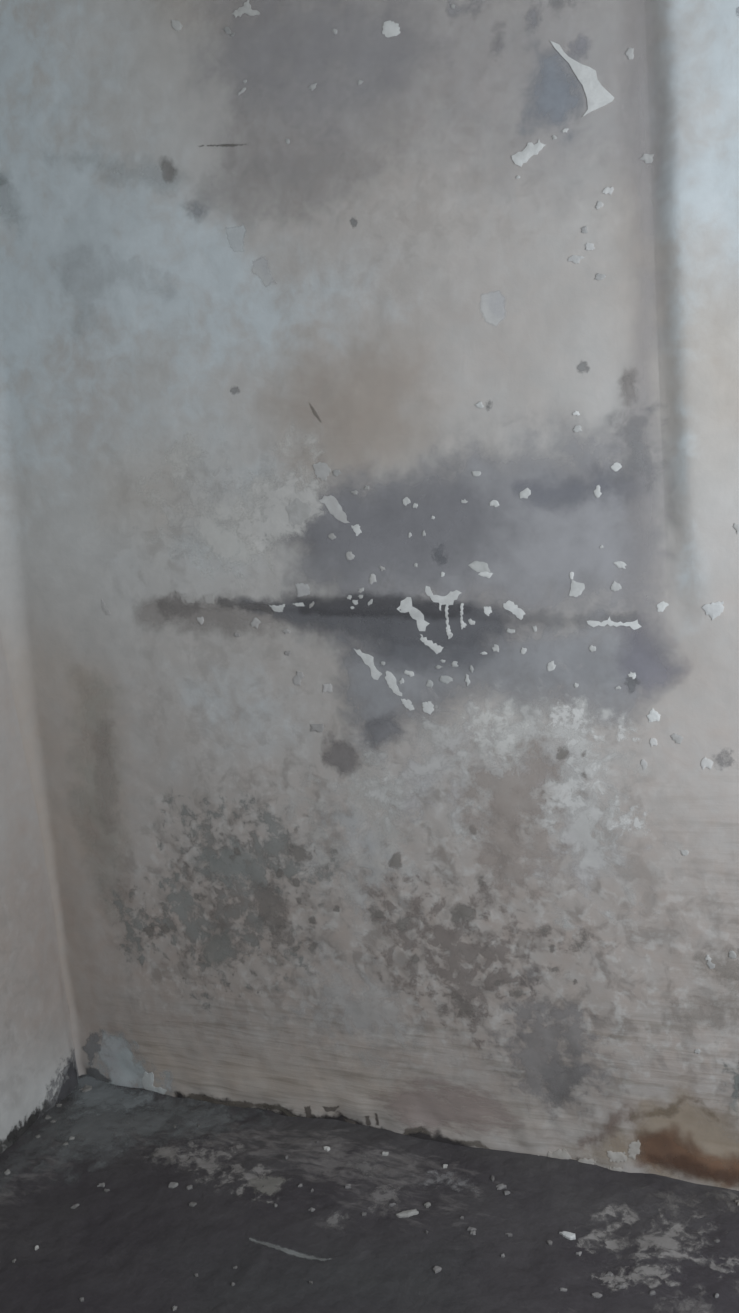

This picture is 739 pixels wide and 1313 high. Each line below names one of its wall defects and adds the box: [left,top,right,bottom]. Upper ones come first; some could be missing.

peeling [550,41,614,116]
peeling [511,128,569,179]
peeling [269,583,315,612]
crack [140,596,503,657]
spalling [346,566,385,609]
water stain [114,798,339,988]
water stain [370,746,605,1104]
peeling [142,1072,167,1094]
rust [607,1105,739,1185]